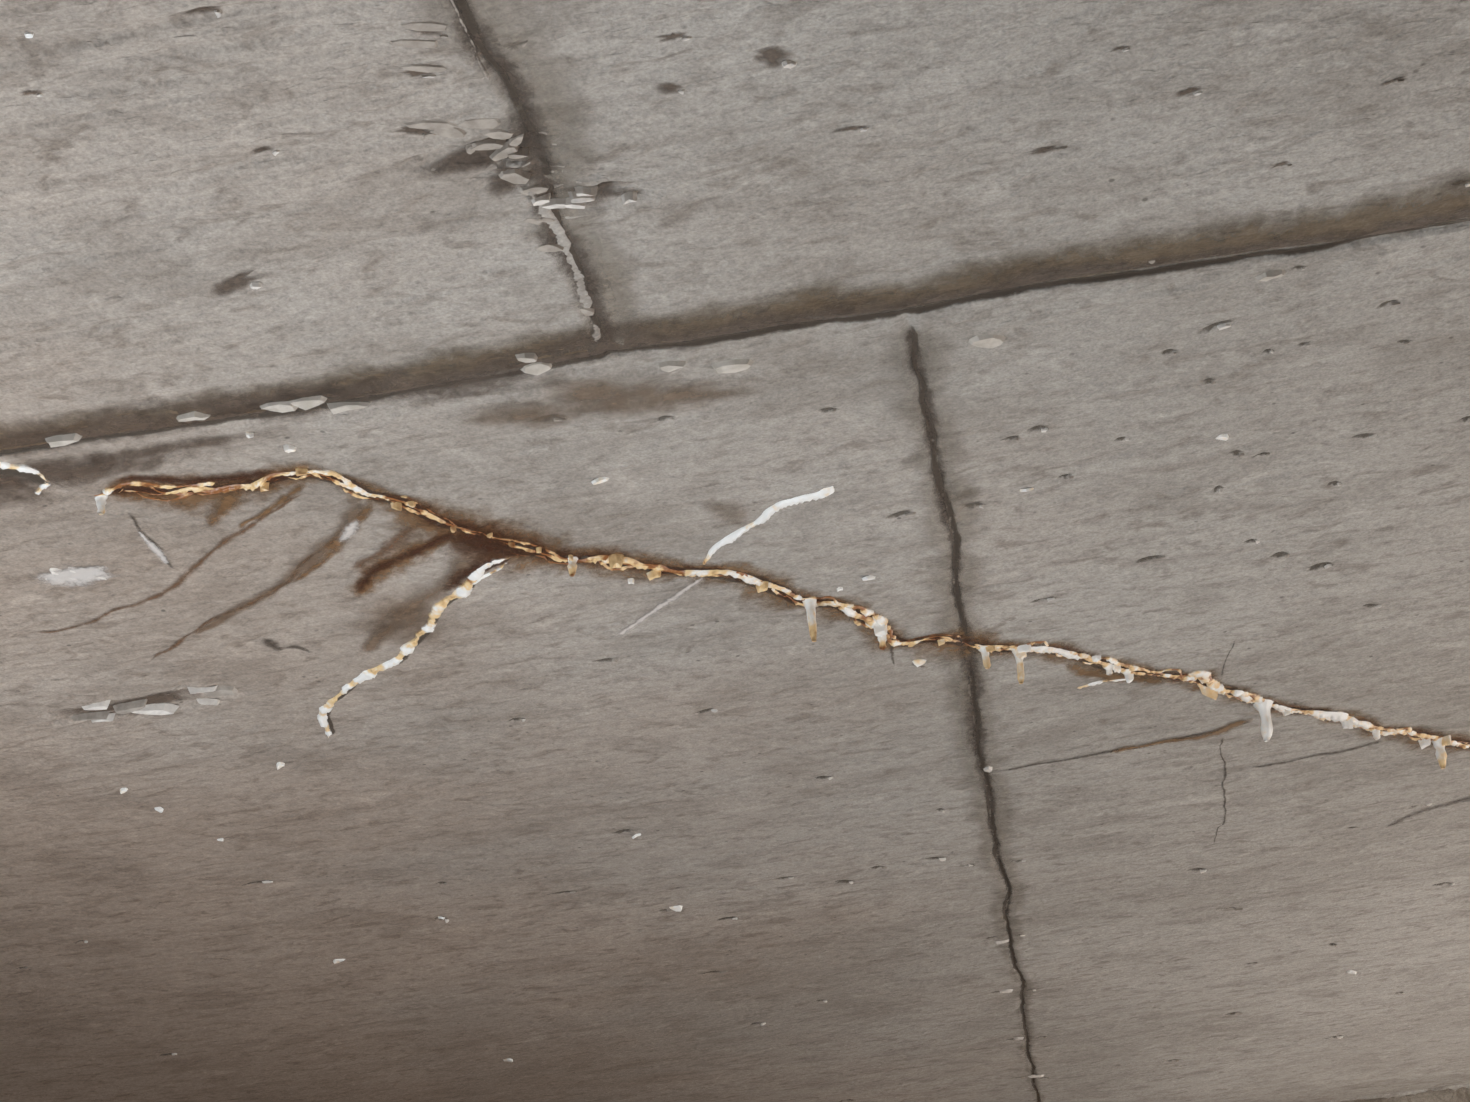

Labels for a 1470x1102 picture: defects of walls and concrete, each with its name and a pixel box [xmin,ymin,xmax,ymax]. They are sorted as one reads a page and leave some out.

spalling [403,118,637,225]
crack [0,462,51,495]
spalling [71,685,238,722]
crack [41,464,1470,841]